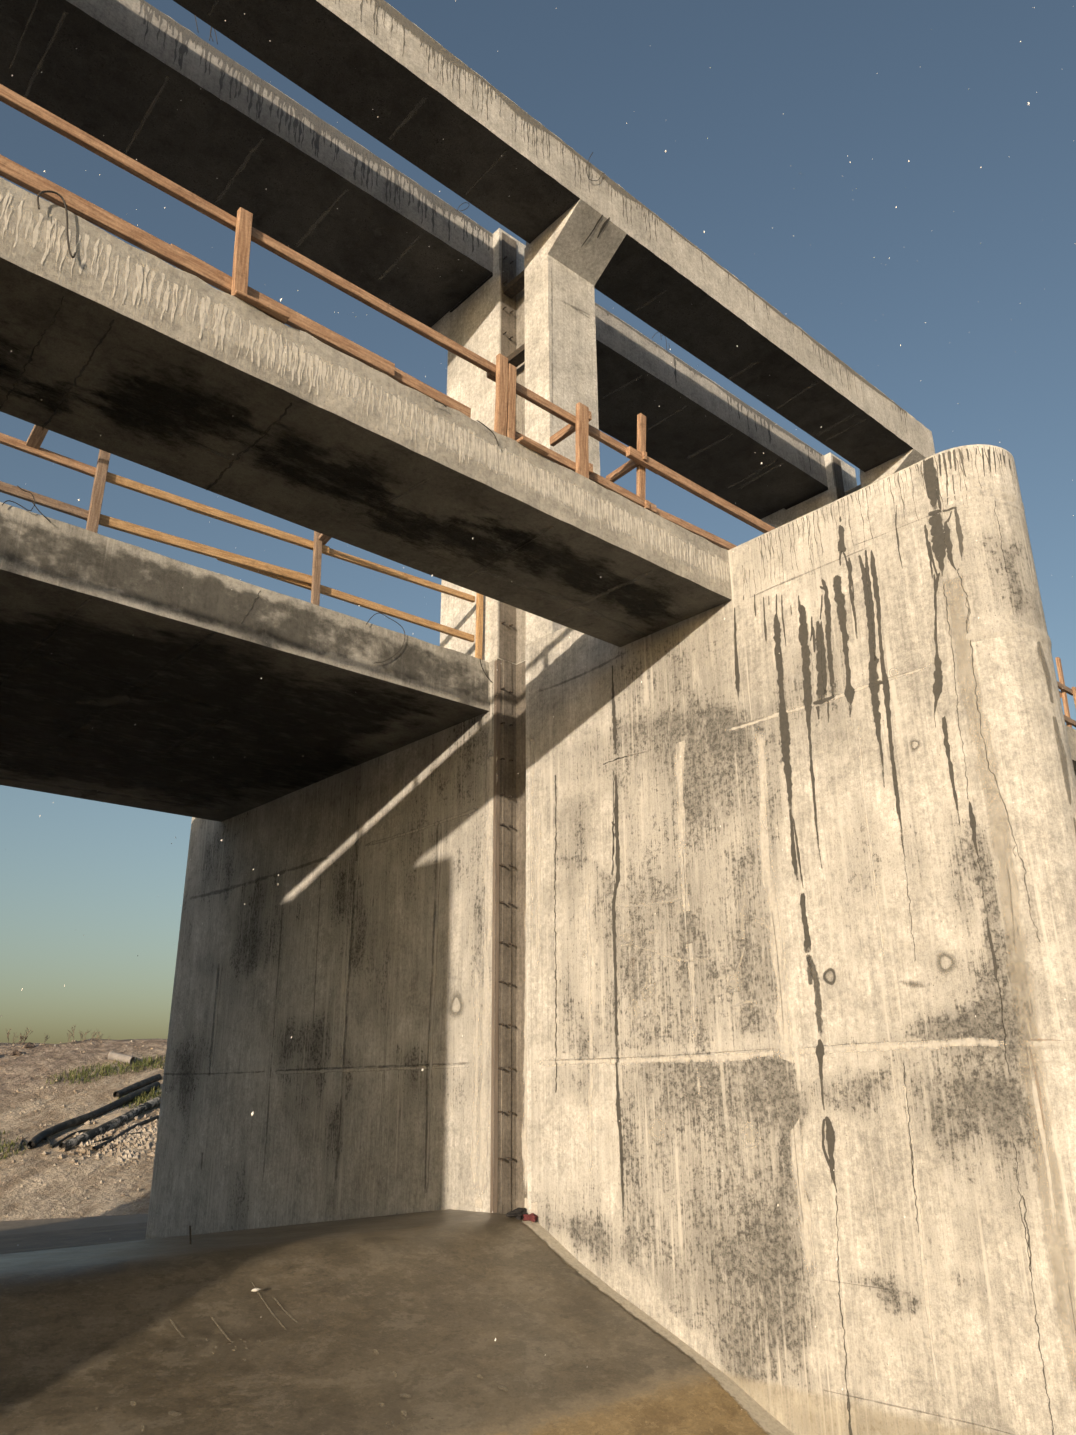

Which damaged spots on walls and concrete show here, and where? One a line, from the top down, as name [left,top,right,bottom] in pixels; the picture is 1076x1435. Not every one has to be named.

damp [139,0,492,252]
damp [360,0,908,431]
damp [0,192,1016,1192]
crack [603,666,627,1217]
crack [835,1196,849,1412]
crack [1013,1143,1054,1435]